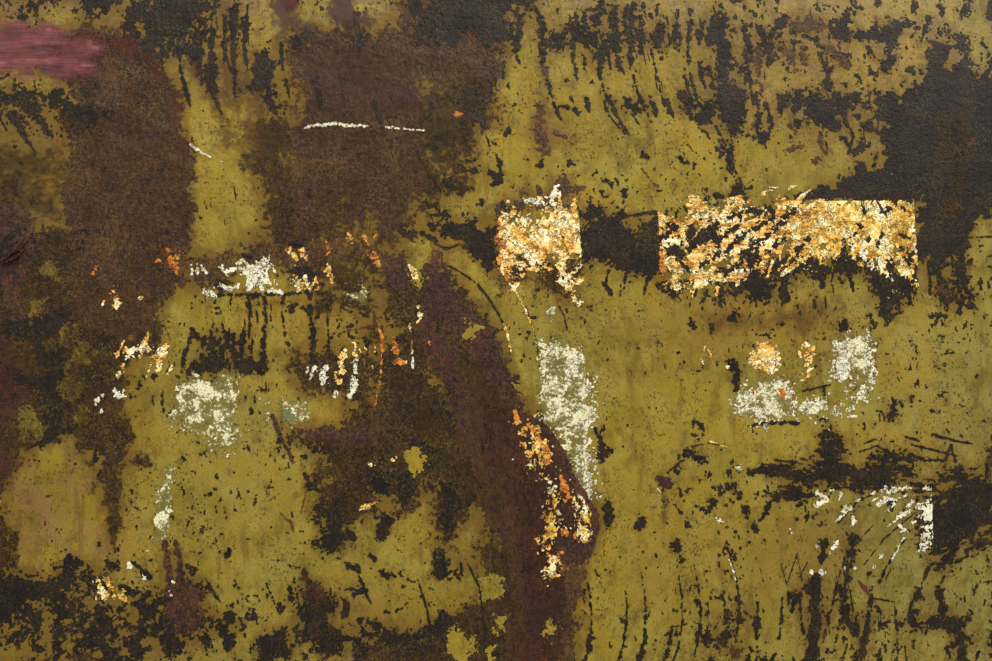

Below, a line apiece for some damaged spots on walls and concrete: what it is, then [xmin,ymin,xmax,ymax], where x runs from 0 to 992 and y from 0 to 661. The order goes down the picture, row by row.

rust [269,0,324,41]
rust [327,0,370,28]
rust [0,335,36,424]
peeling [244,382,279,415]
rust [379,249,601,661]
peeling [173,479,257,562]